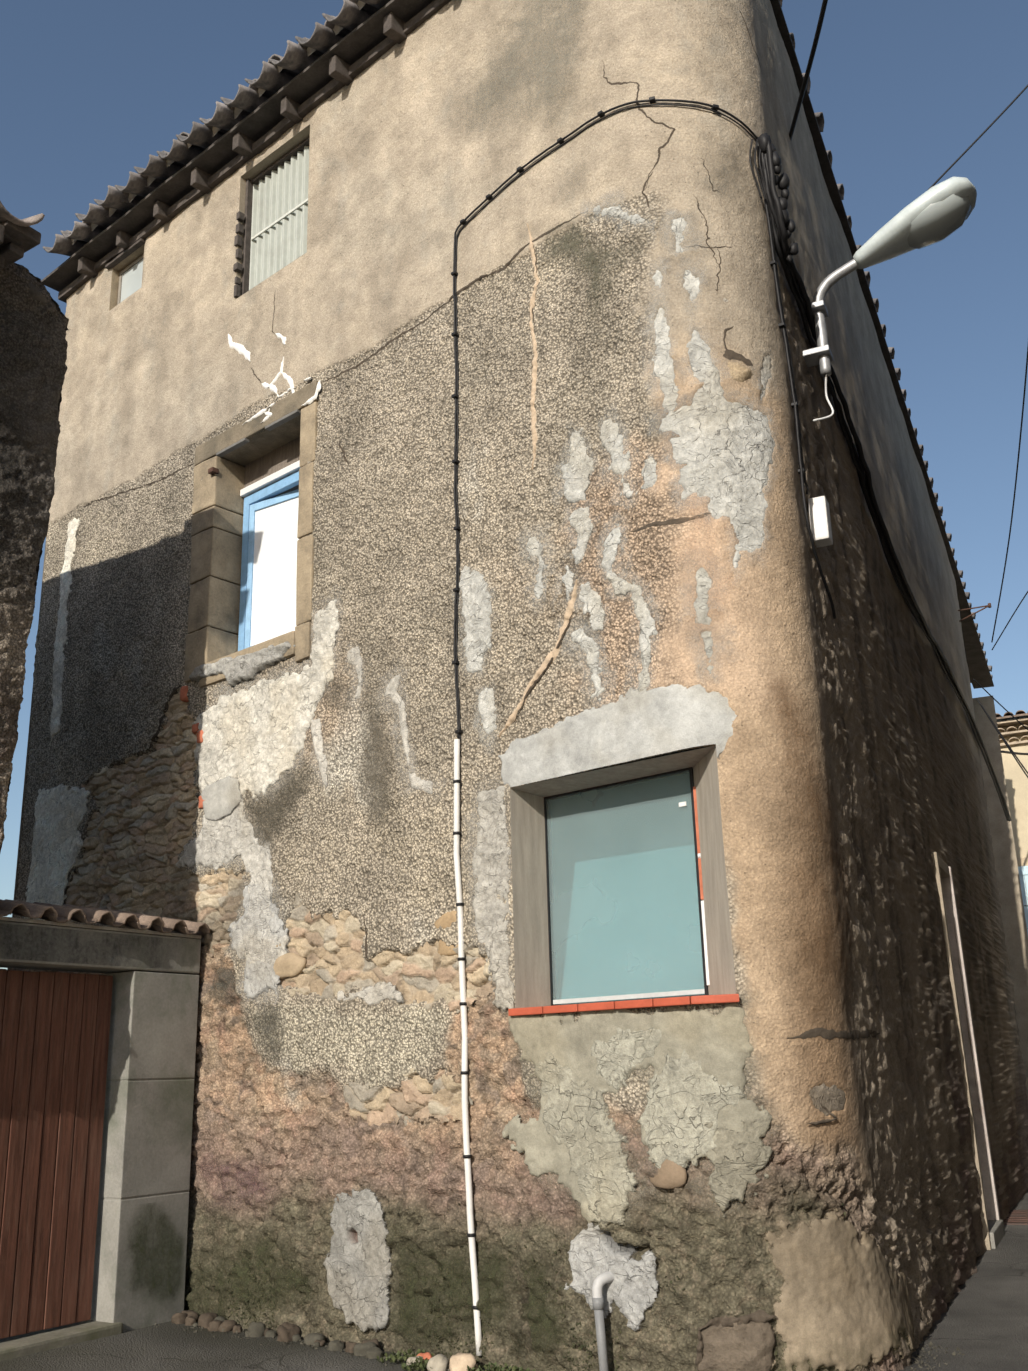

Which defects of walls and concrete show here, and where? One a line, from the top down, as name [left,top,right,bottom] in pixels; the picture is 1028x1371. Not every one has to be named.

crack [603,69,675,208]
crack [228,211,587,470]
peeling [651,308,775,464]
peeling [49,518,81,745]
crack [498,579,578,737]
peeling [562,507,594,600]
spalling [24,686,494,1013]
spalling [343,1065,473,1128]
peeling [535,1027,773,1224]
crack [787,1027,880,1041]
leakage [398,1249,505,1339]
leakage [521,1268,561,1351]